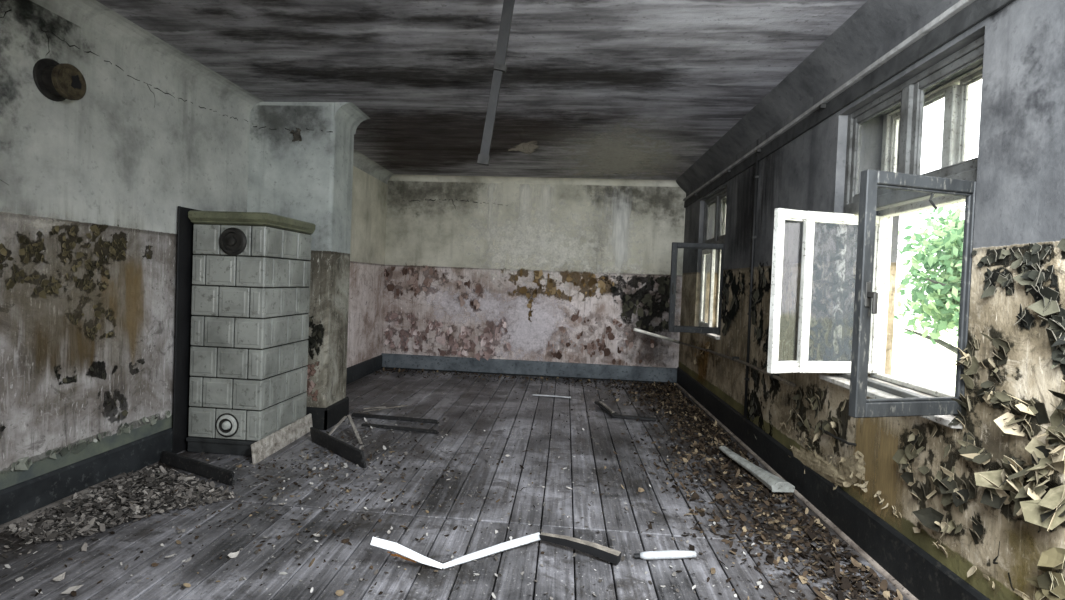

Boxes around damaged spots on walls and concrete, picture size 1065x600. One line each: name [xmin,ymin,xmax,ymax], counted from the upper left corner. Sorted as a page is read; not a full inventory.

mould [15,0,69,38]
leakage [219,0,376,43]
leakage [253,52,678,90]
leakage [363,111,629,169]
peeling [0,220,128,341]
peeling [384,266,484,312]
peeling [384,313,511,361]
peeling [501,269,677,365]
peeling [46,359,172,459]
peeling [719,239,1065,557]
peeling [967,559,995,590]
peeling [1026,547,1065,600]